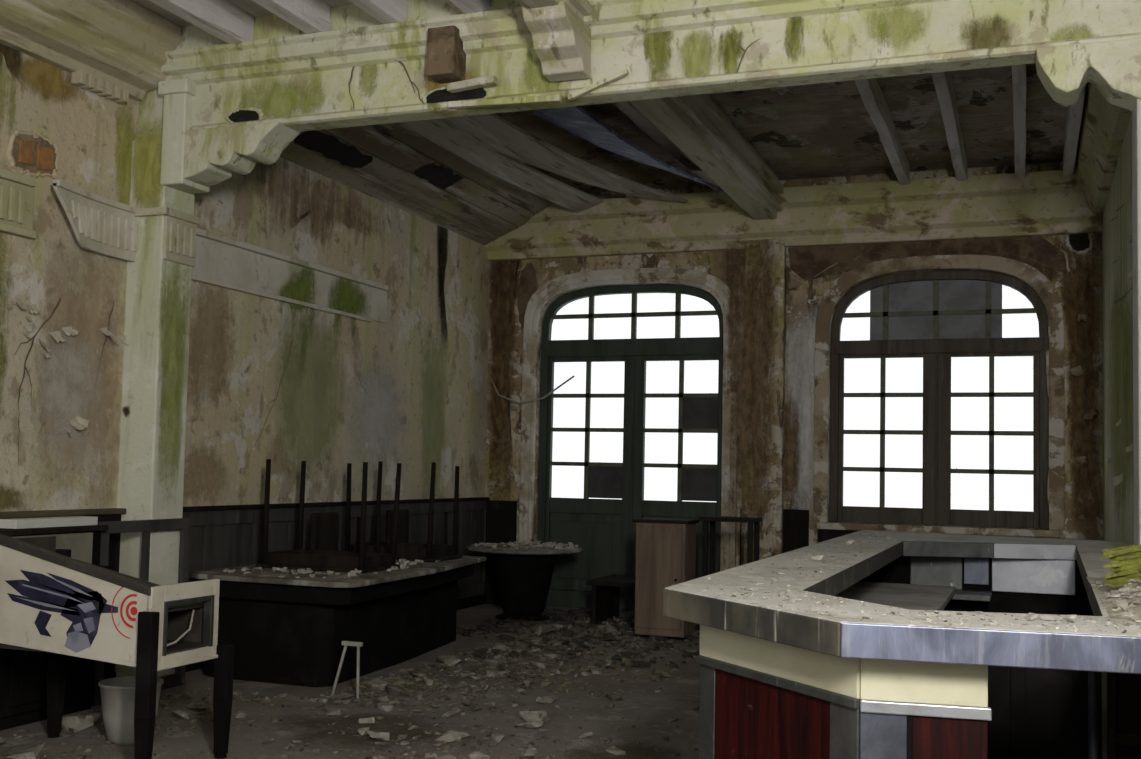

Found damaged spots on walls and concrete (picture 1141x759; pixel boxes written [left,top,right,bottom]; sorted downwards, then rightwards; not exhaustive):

water stain [0,43,21,78]
flaking render [6,129,59,179]
flaking render [515,260,539,332]
crack [14,298,61,461]